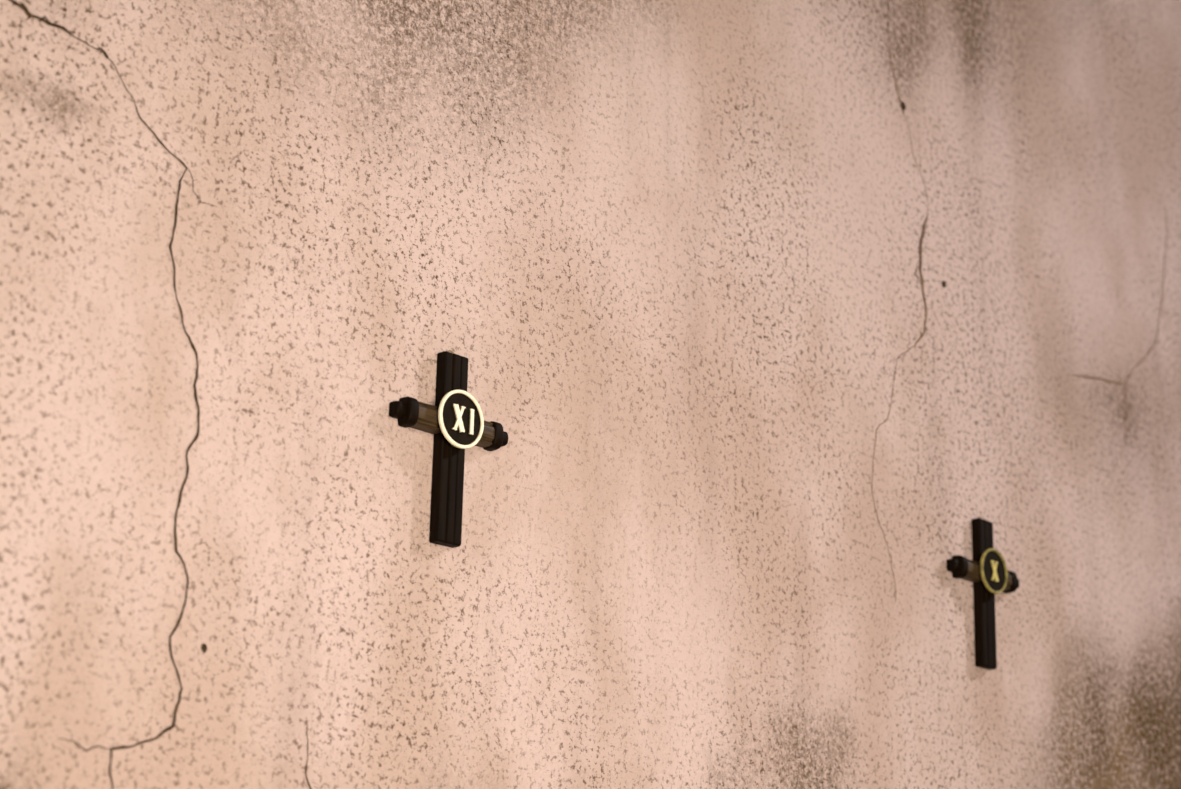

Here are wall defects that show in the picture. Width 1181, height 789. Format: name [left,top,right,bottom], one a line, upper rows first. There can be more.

crack [9,0,217,789]
crack [872,1,929,594]
crack [304,723,312,789]
water stain [1052,634,1181,789]